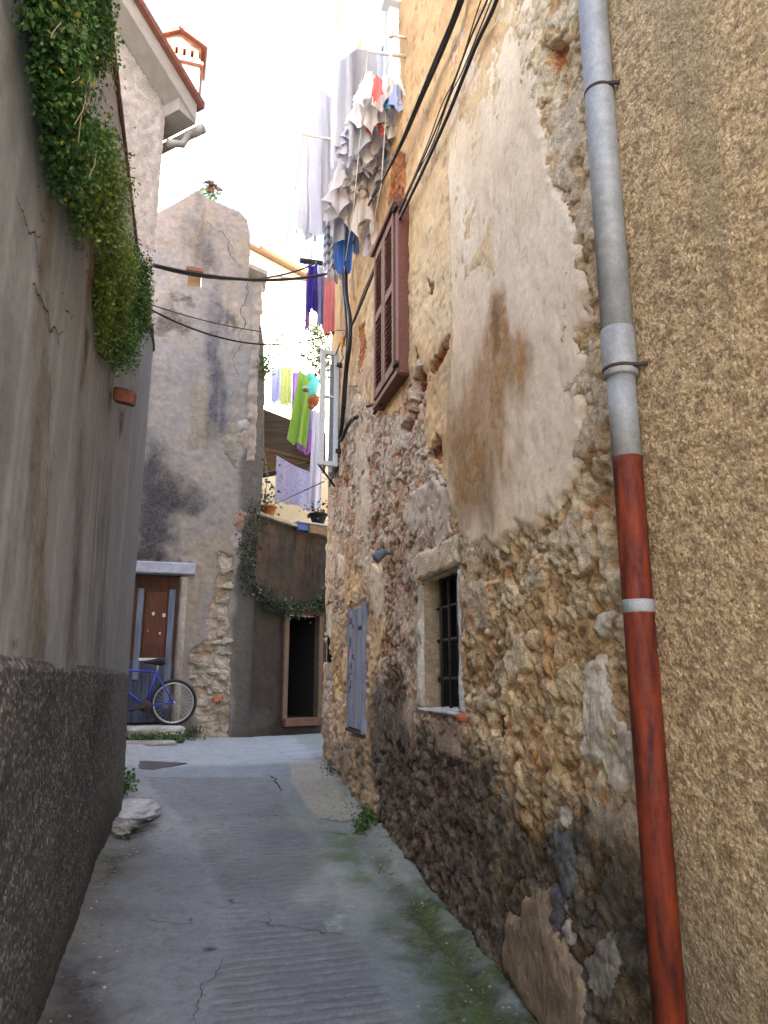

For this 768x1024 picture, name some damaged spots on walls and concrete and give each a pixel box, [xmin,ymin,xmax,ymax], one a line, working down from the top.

crack [16,197,73,601]
crack [206,220,250,376]
water stain [446,294,527,507]
water stain [137,453,203,562]
spalling [329,0,652,1024]
crack [189,961,222,1021]